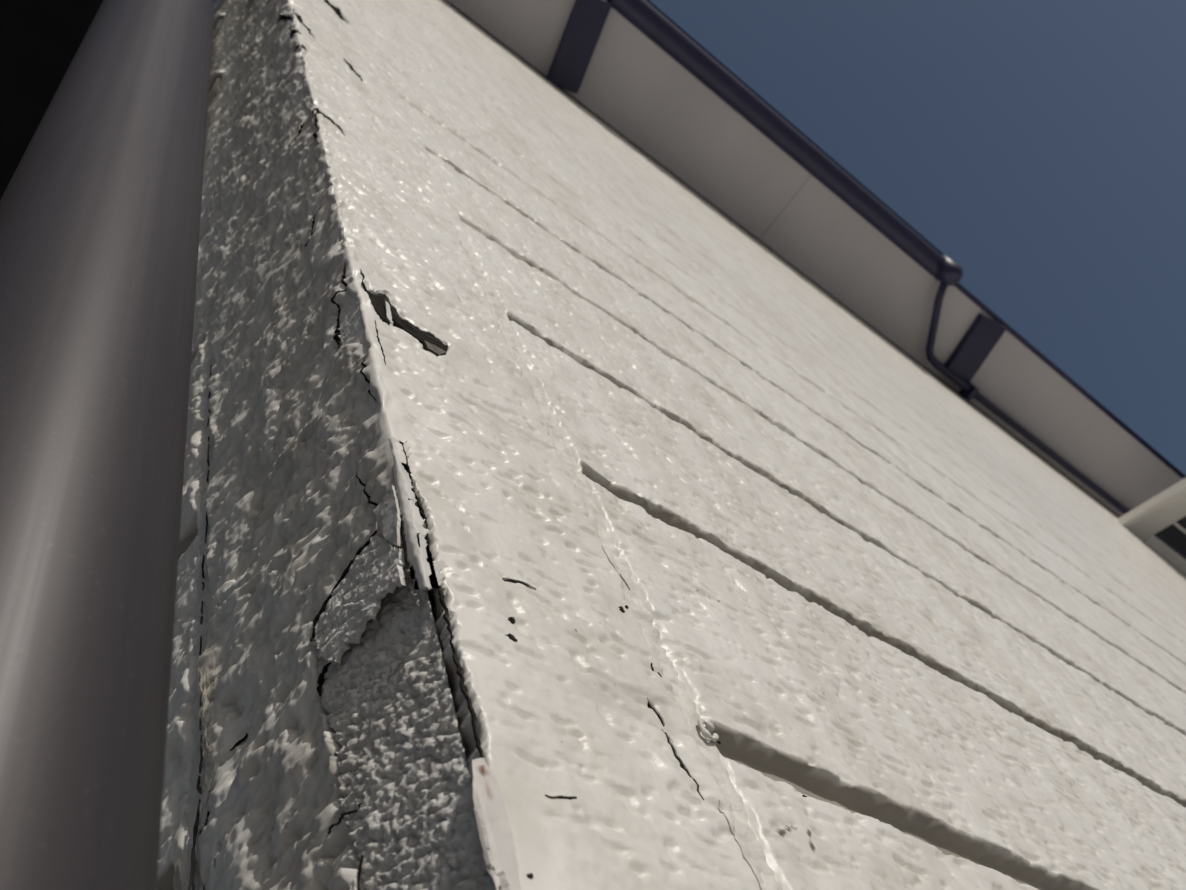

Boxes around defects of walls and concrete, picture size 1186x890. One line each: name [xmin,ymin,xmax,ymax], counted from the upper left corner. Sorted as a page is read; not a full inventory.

crack [292,9,315,38]
crack [309,107,347,144]
crack [324,0,349,24]
crack [344,59,363,81]
peeling [330,262,449,402]
crack [188,364,248,890]
spalling [310,437,512,890]
crack [647,663,762,890]